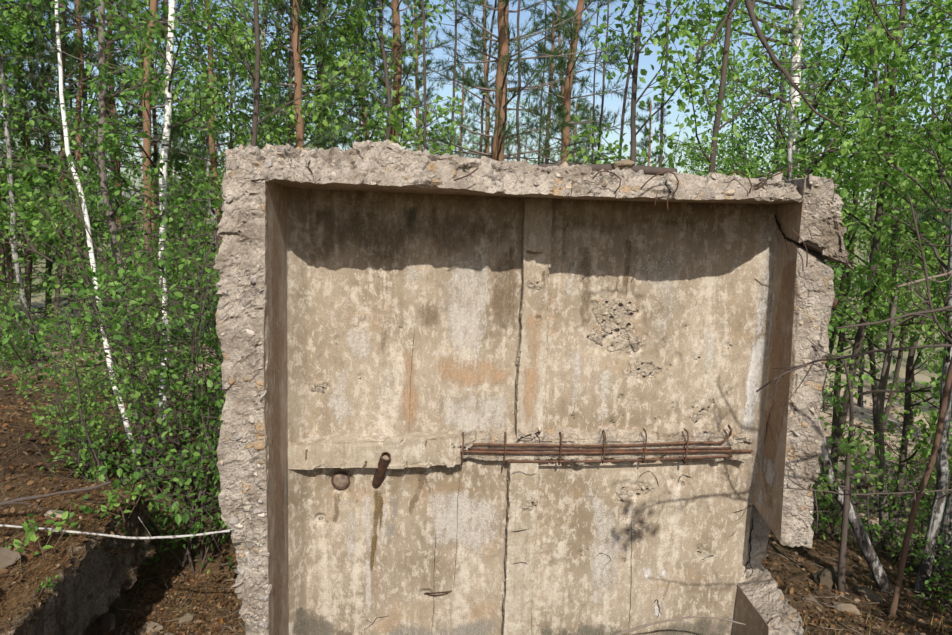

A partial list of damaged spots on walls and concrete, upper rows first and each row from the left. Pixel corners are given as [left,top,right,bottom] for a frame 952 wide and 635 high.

crack [775,215,801,258]
spalling [587,297,679,380]
spalling [447,437,474,451]
corrosion [369,491,383,569]